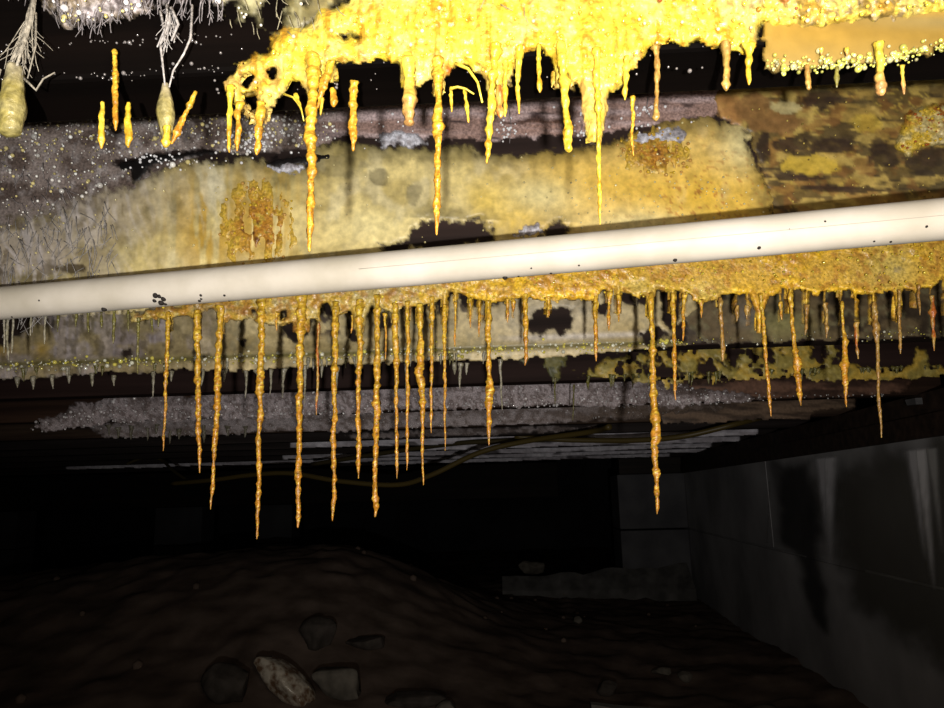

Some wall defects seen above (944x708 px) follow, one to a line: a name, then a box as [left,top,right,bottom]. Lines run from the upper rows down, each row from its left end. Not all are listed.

water stain [191,0,346,45]
rust [218,178,297,264]
water stain [0,12,944,287]
water stain [0,279,944,469]